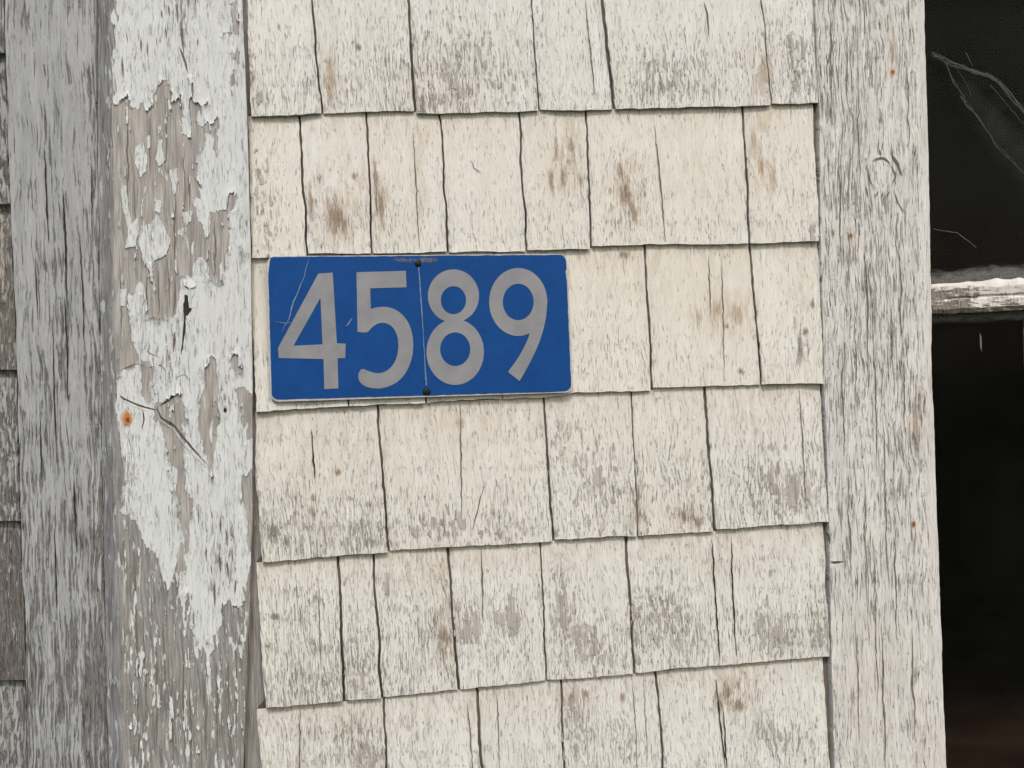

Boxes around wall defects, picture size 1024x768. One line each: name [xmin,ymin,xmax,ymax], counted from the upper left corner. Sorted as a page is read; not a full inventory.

peeling [225,1,239,37]
crack [115,97,208,467]
peeling [105,80,252,768]
crack [211,220,219,274]